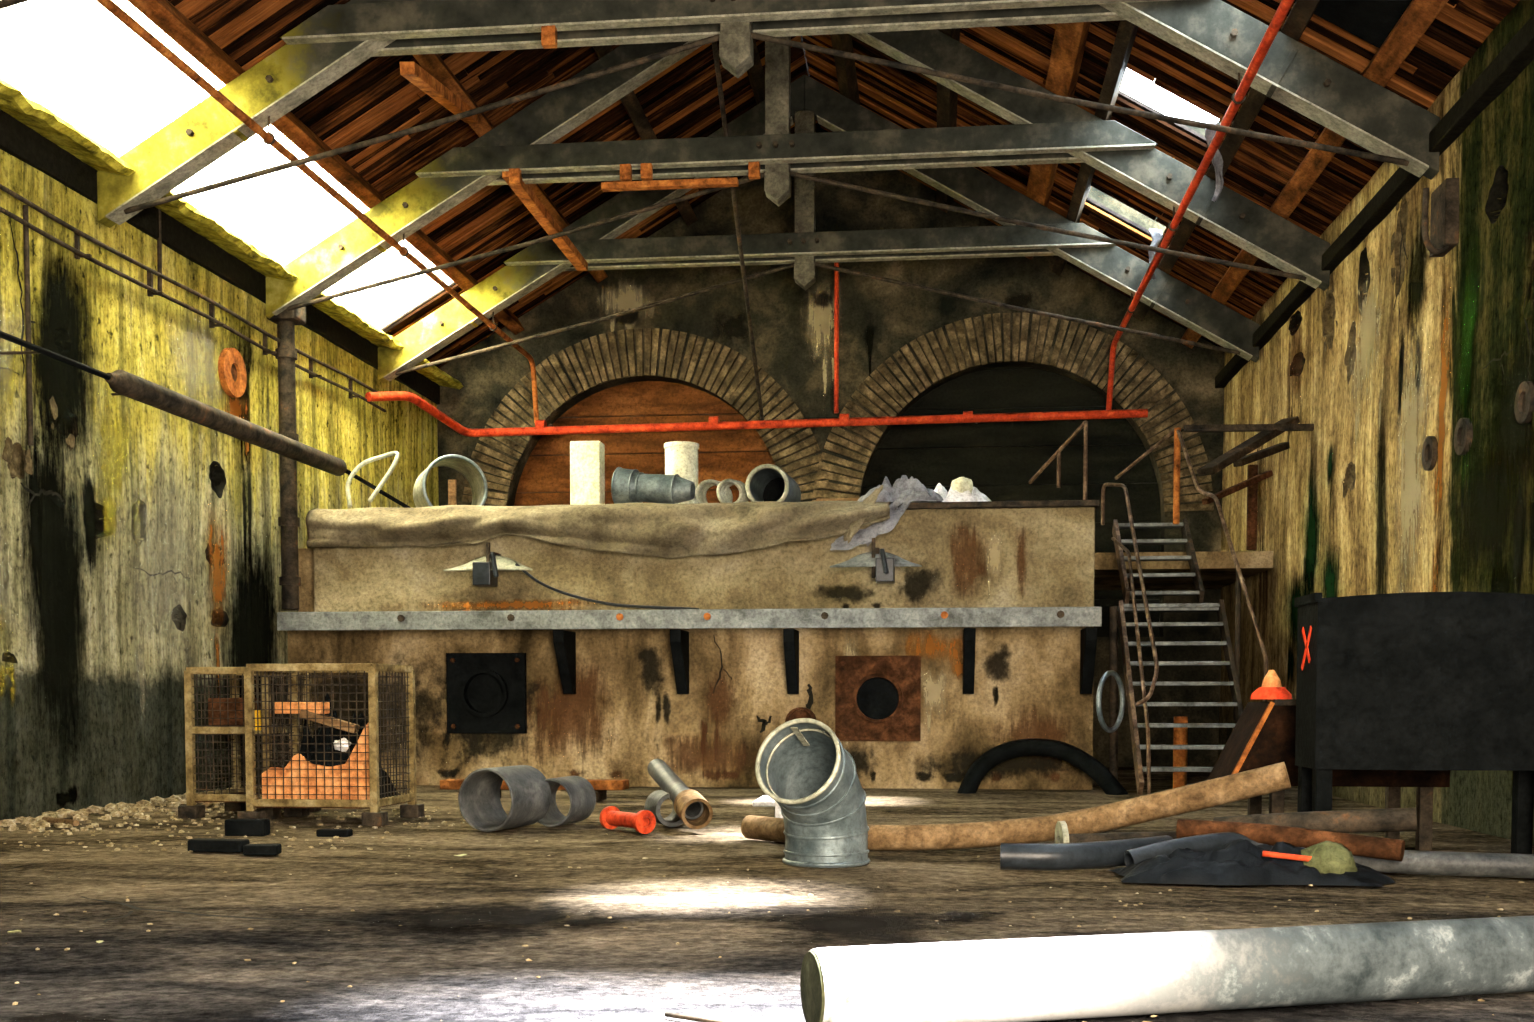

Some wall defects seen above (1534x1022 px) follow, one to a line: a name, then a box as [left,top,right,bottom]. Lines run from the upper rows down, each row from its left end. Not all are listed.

damp [4,250,116,751]
rust [950,525,988,595]
rust [1017,530,1026,593]
damp [0,665,14,694]
damp [56,786,77,807]